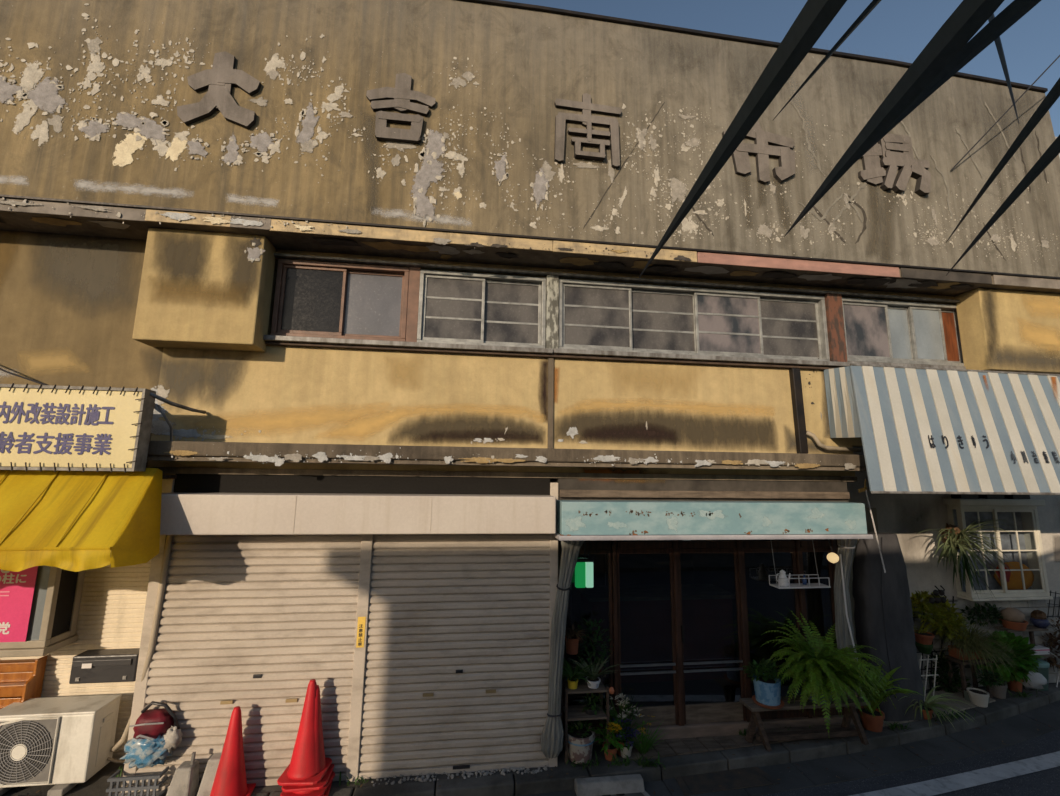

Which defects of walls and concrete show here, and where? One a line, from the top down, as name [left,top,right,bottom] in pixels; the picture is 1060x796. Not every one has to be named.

peeling [0,3,365,183]
peeling [141,57,867,274]
water stain [38,234,130,306]
water stain [27,353,78,371]
water stain [196,408,543,441]
spalling [558,427,587,444]
water stain [555,401,775,447]
peeling [439,454,547,464]
peeling [584,454,821,469]